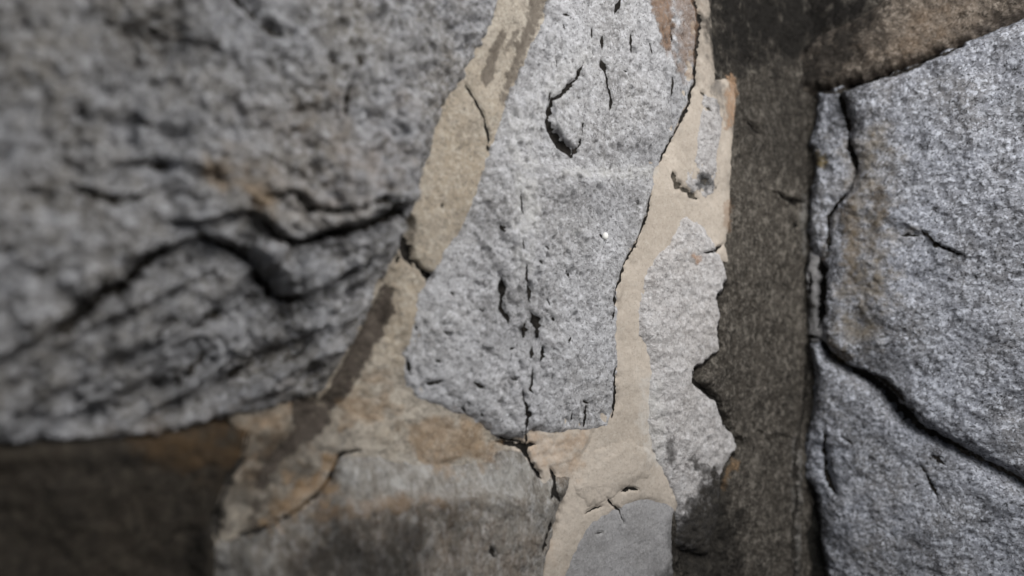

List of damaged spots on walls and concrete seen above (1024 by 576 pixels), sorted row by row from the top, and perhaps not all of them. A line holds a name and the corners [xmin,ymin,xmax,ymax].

crack [613,0,621,14]
crack [132,118,158,127]
crack [545,28,613,158]
crack [68,158,170,206]
crack [51,229,305,339]
crack [260,192,431,282]
crack [790,45,968,576]
crack [496,240,560,551]